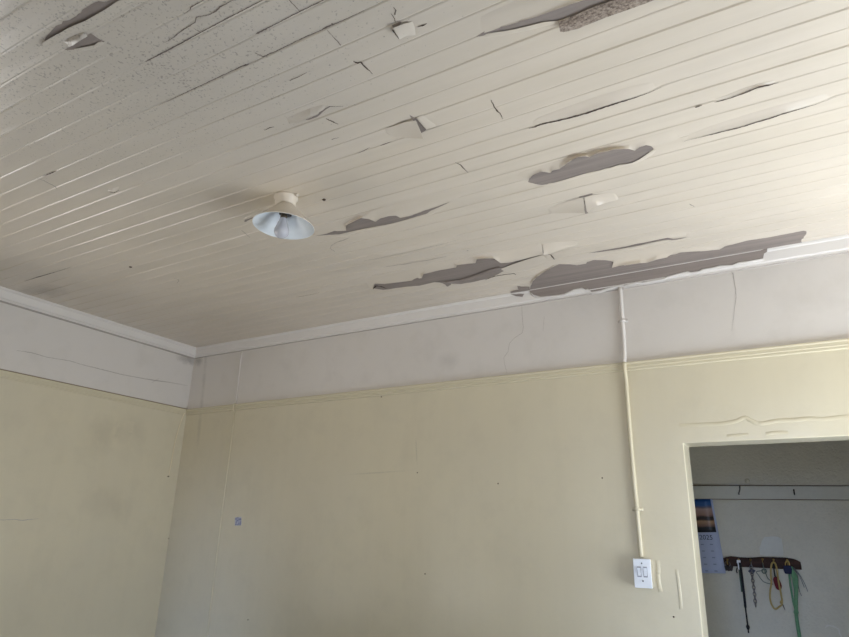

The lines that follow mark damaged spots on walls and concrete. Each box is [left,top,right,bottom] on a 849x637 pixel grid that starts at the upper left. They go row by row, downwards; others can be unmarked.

peeling [42,0,136,52]
crack [146,0,362,105]
peeling [391,8,427,39]
peeling [476,0,653,38]
peeling [516,123,682,186]
peeling [315,181,475,238]
peeling [366,231,807,299]